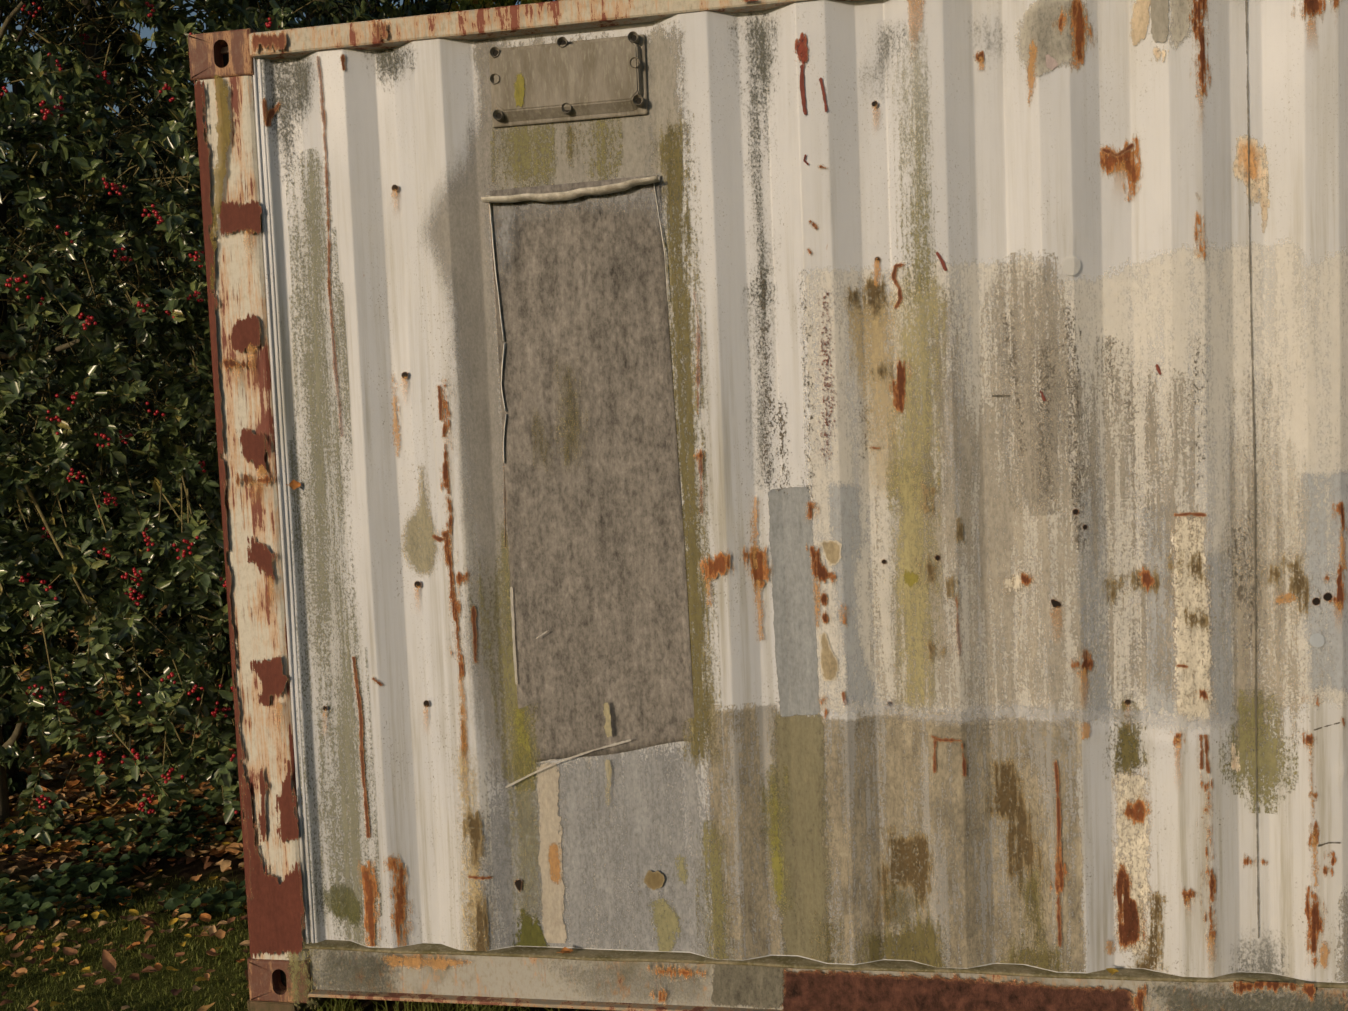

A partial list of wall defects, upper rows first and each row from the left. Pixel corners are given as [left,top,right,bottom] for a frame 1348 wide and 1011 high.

damp [800,64,828,115]
peeling [1058,0,1092,70]
peeling [1130,0,1211,95]
corrosion [1302,0,1339,25]
corrosion [1100,136,1141,201]
peeling [1233,135,1270,232]
damp [731,14,779,490]
corrosion [700,496,770,641]
corrosion [361,379,500,970]
corrosion [1302,718,1345,968]
damp [1013,869,1052,946]
corrosion [782,970,1146,1011]